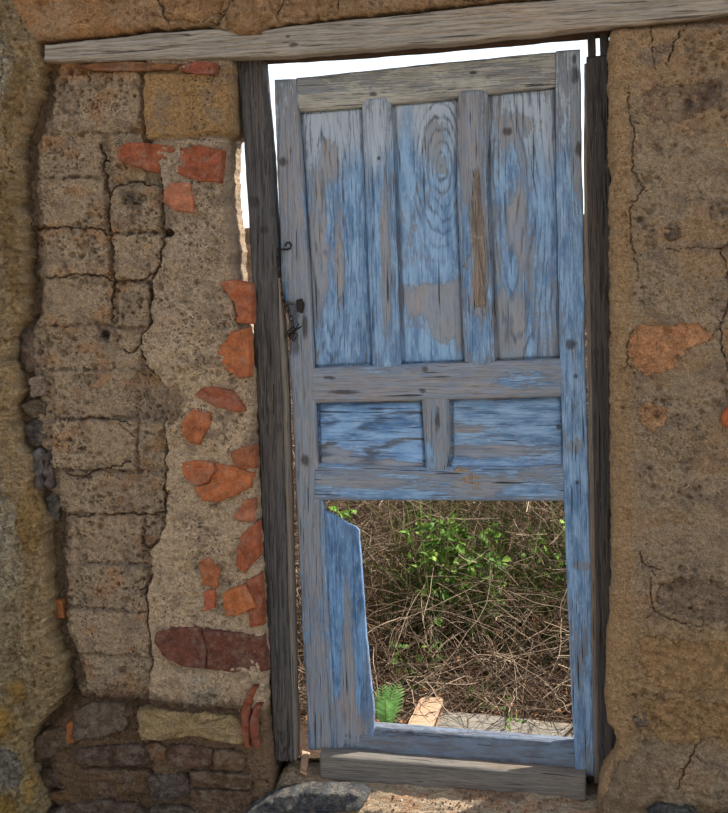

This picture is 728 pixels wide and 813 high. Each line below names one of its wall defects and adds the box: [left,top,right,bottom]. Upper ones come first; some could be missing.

crack [650,24,688,70]
crack [627,85,648,271]
crack [37,144,170,383]
crack [667,243,728,281]
crack [706,301,728,371]
crack [56,416,139,439]
crack [56,418,169,681]